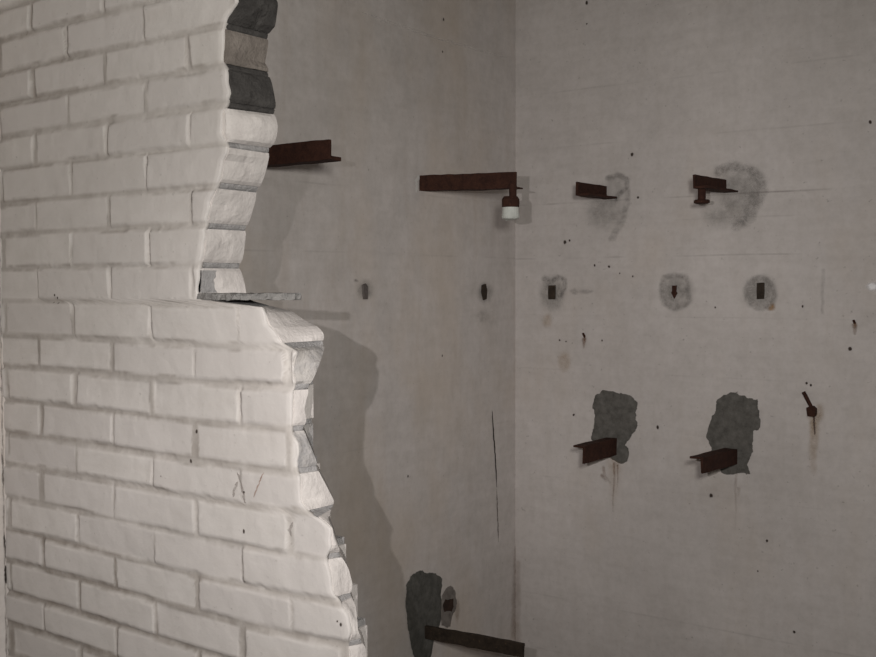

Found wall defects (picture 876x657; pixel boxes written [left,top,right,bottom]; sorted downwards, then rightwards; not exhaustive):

spalling [197,0,367,657]
flaking render [441,586,457,628]